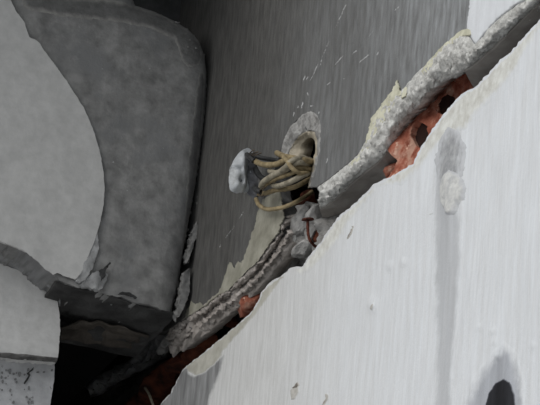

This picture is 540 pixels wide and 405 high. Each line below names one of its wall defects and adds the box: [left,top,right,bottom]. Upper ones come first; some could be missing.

spalling [44,233,174,357]
spalling [124,0,540,405]